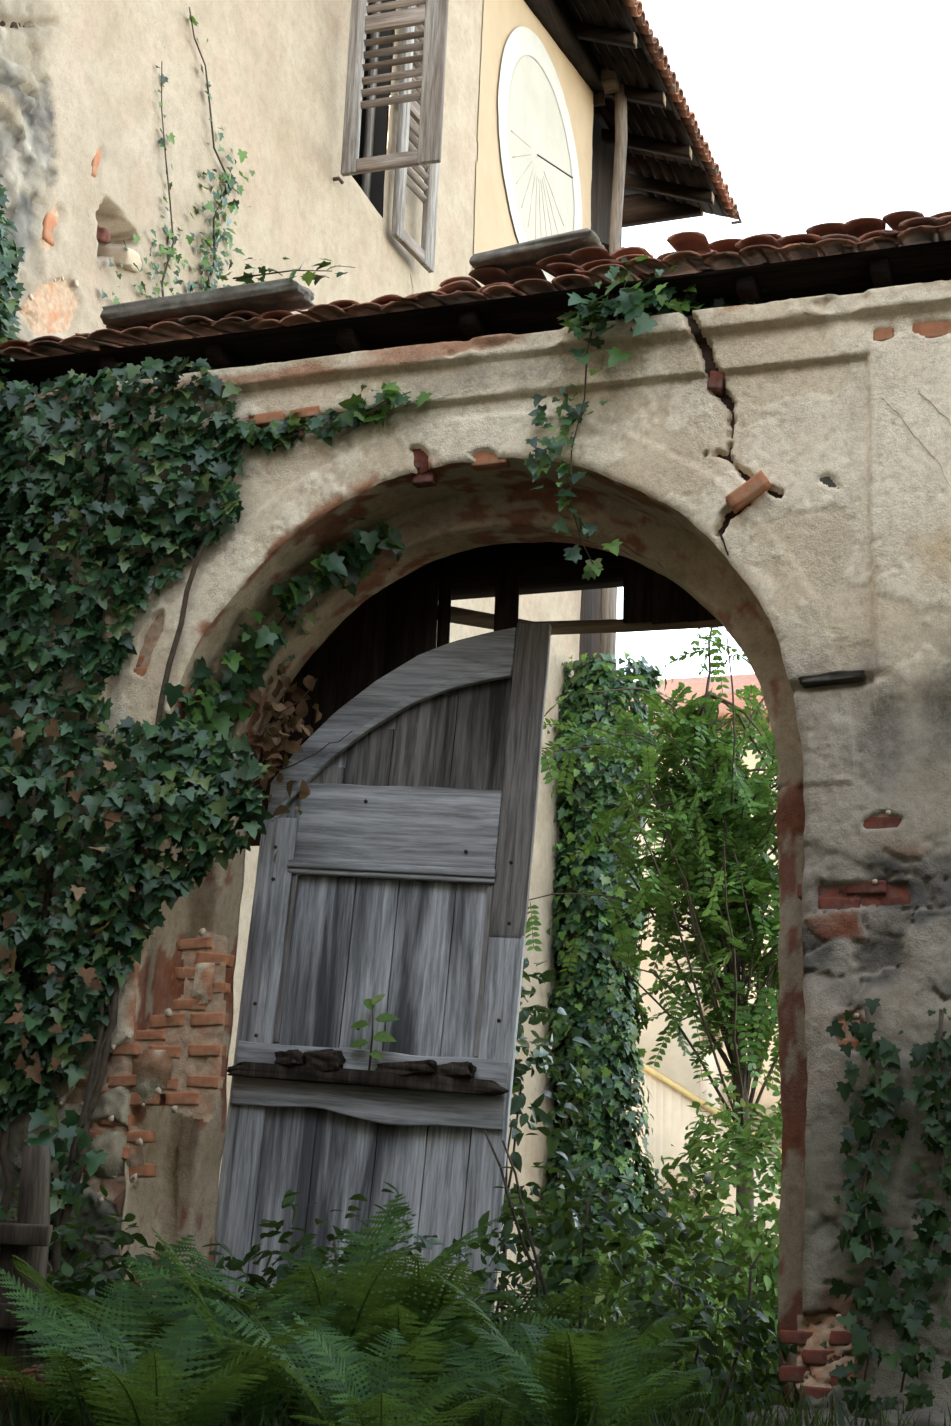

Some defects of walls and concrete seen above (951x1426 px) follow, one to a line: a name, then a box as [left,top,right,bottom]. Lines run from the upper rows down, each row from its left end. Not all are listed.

spalling [40,205,60,252]
spalling [96,225,142,273]
spalling [19,276,79,336]
spalling [873,327,894,341]
spalling [912,321,951,338]
crack [686,316,784,556]
spalling [863,810,902,829]
spalling [797,879,910,910]
peeling [57,928,235,1204]
spalling [779,1314,855,1402]